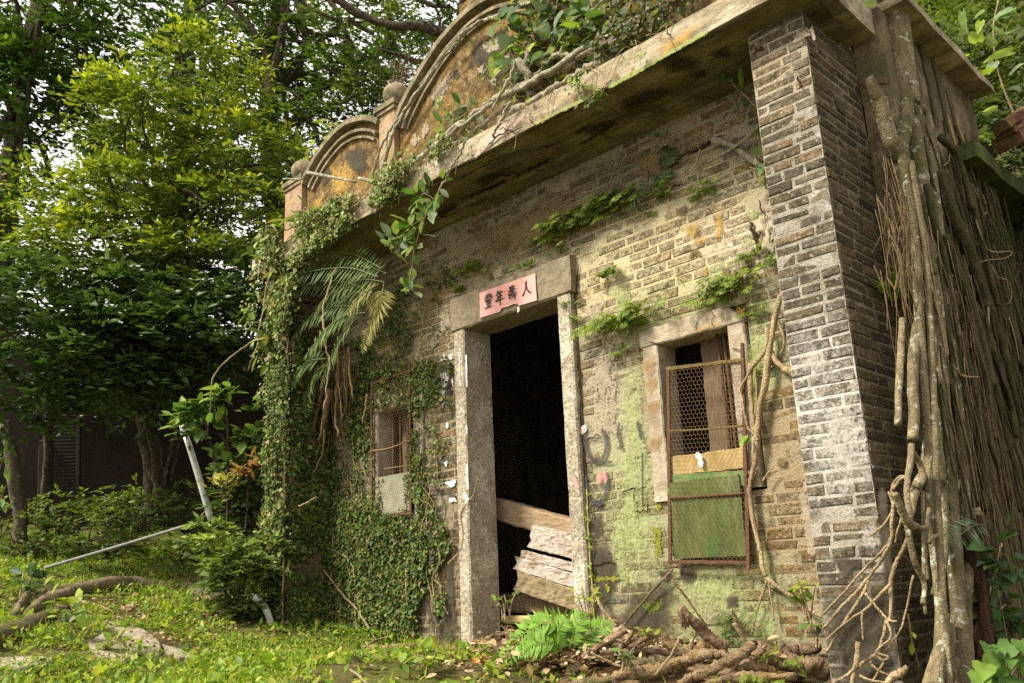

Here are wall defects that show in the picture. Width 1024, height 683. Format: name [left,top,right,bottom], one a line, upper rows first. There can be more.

damp [453,30,511,88]
damp [473,114,523,157]
damp [534,87,591,125]
damp [582,89,668,136]
damp [314,147,368,207]
damp [473,196,577,256]
damp [621,454,648,521]
damp [590,515,695,638]